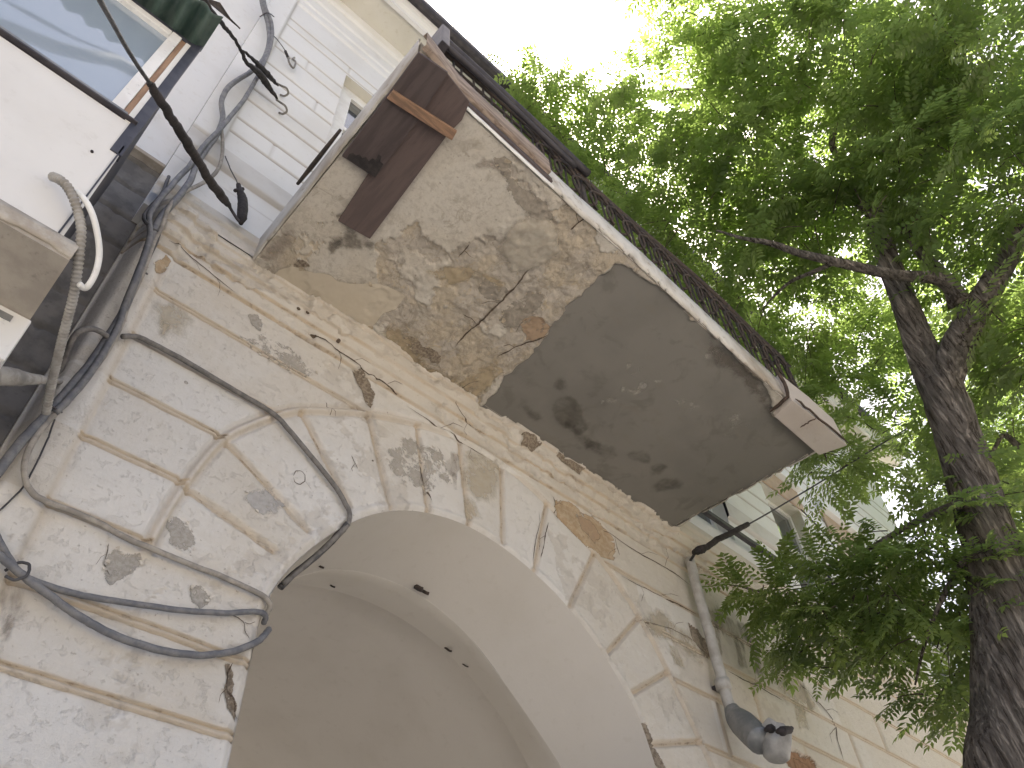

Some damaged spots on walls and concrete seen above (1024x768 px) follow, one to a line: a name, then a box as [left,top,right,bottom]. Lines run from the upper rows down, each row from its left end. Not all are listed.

peeling [494,157,553,223]
crack [456,269,530,346]
crack [499,320,547,356]
spalling [353,369,375,408]
crack [314,335,485,460]
crack [770,368,848,443]
peeling [372,438,450,494]
spalling [521,432,542,452]
peeling [166,516,196,551]
peeling [555,500,615,560]
peeling [102,546,145,585]
spalling [222,664,237,721]